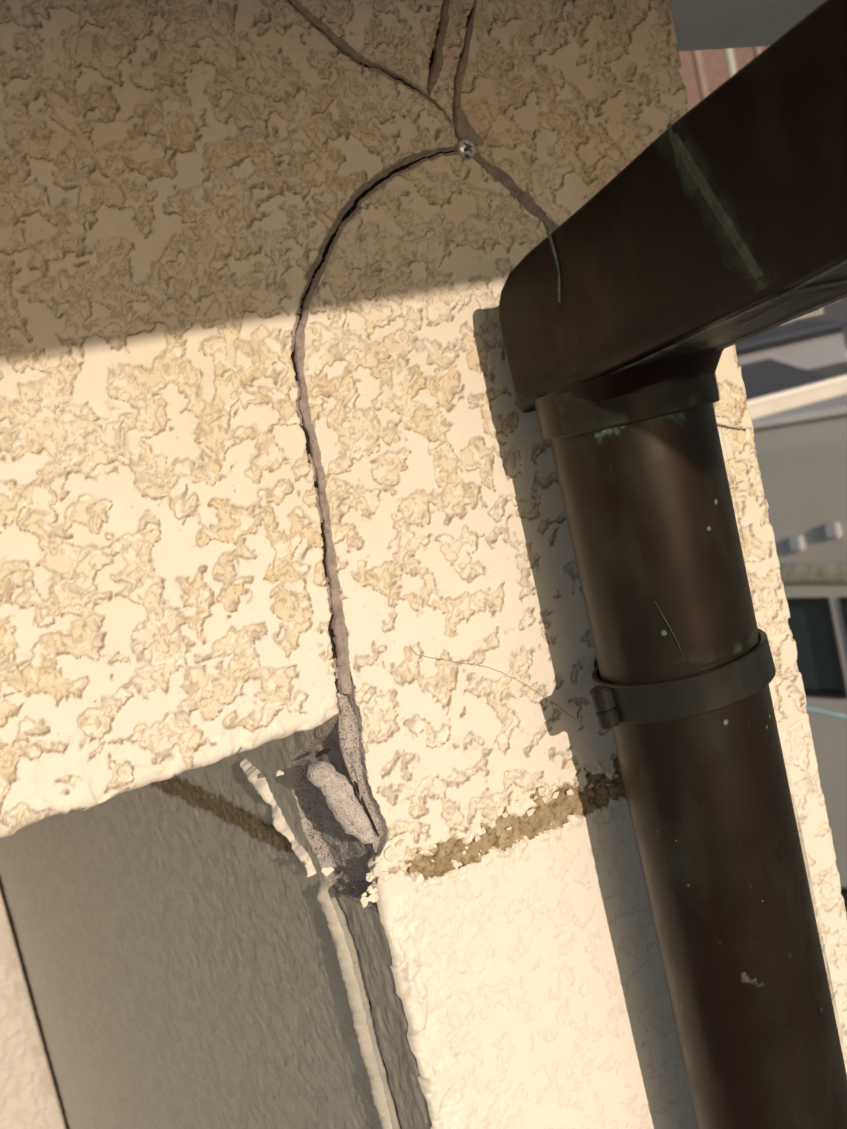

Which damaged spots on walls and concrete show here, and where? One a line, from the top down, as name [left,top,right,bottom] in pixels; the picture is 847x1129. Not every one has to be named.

crack [285,0,559,694]
crack [713,403,746,432]
spalling [149,661,626,911]
crack [411,648,577,721]